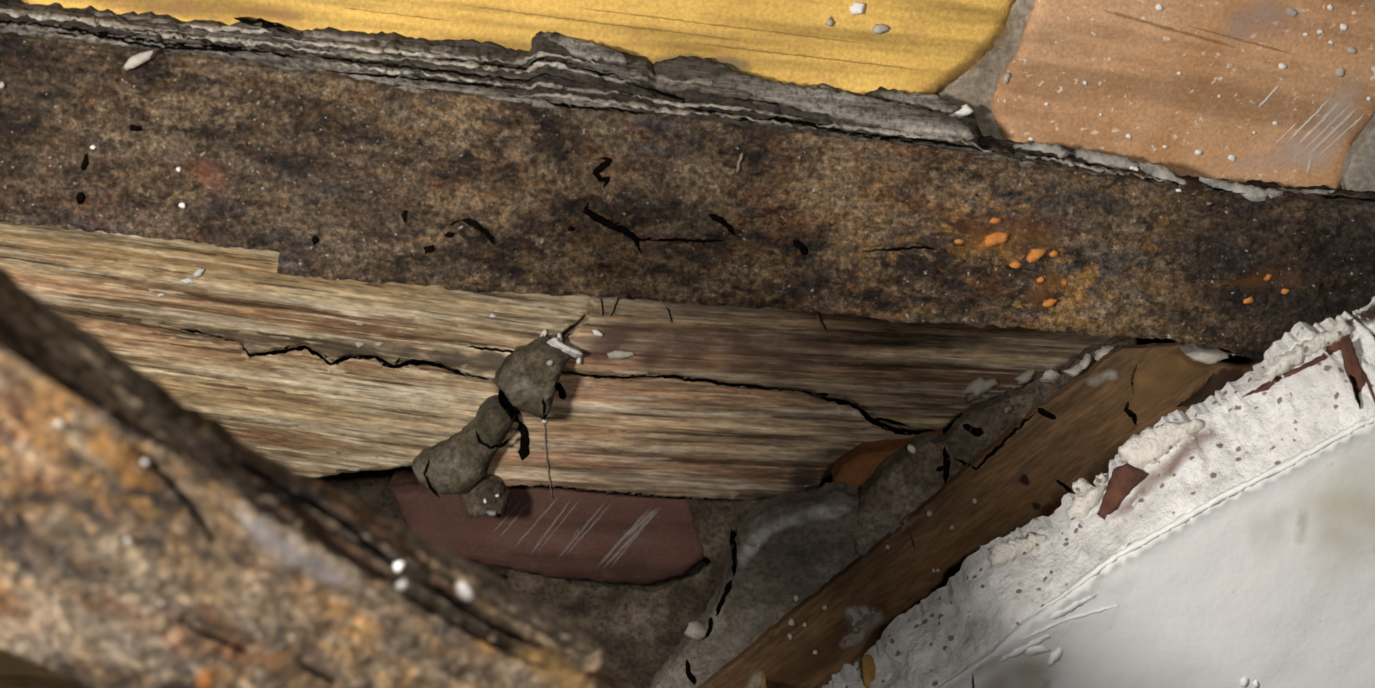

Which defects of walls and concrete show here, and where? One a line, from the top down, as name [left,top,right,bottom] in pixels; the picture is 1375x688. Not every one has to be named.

peeling [849,2,889,34]
peeling [123,49,158,70]
crack [583,157,736,254]
crack [450,218,495,245]
crack [865,245,939,253]
rust [954,218,1009,248]
rust [1009,249,1067,307]
peeling [607,350,635,359]
crack [136,451,216,546]
crack [180,328,1056,685]
flaking render [822,296,1375,688]
peeling [787,595,807,641]